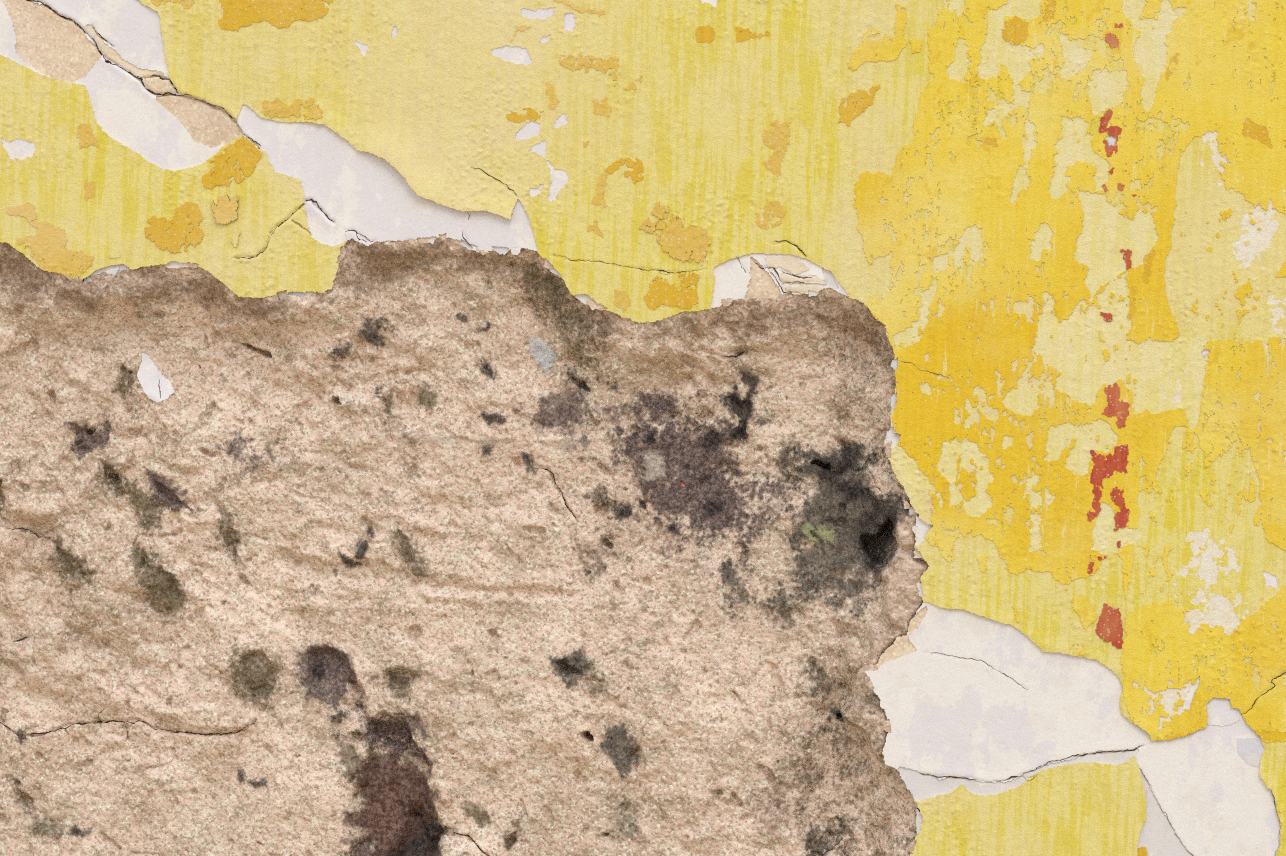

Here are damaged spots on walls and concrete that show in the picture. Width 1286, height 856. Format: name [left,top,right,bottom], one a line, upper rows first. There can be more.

peeling [0,0,538,252]
peeling [515,121,569,202]
peeling [1200,131,1231,186]
damp [0,251,293,319]
damp [336,240,620,338]
peeling [944,0,1210,552]
peeling [1227,200,1280,270]
damp [480,299,912,628]
spalling [0,233,1281,856]
crack [0,709,254,738]
damp [295,643,430,764]
damp [341,817,449,856]